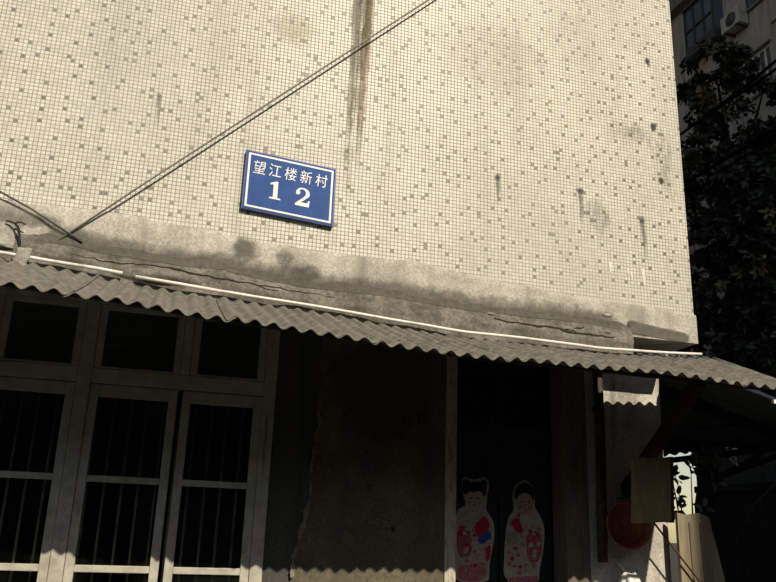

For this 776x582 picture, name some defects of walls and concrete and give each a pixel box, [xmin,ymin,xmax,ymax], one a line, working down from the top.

corrosion [348,0,373,133]
crack [75,254,330,297]
water stain [0,207,689,342]
crack [494,318,612,338]